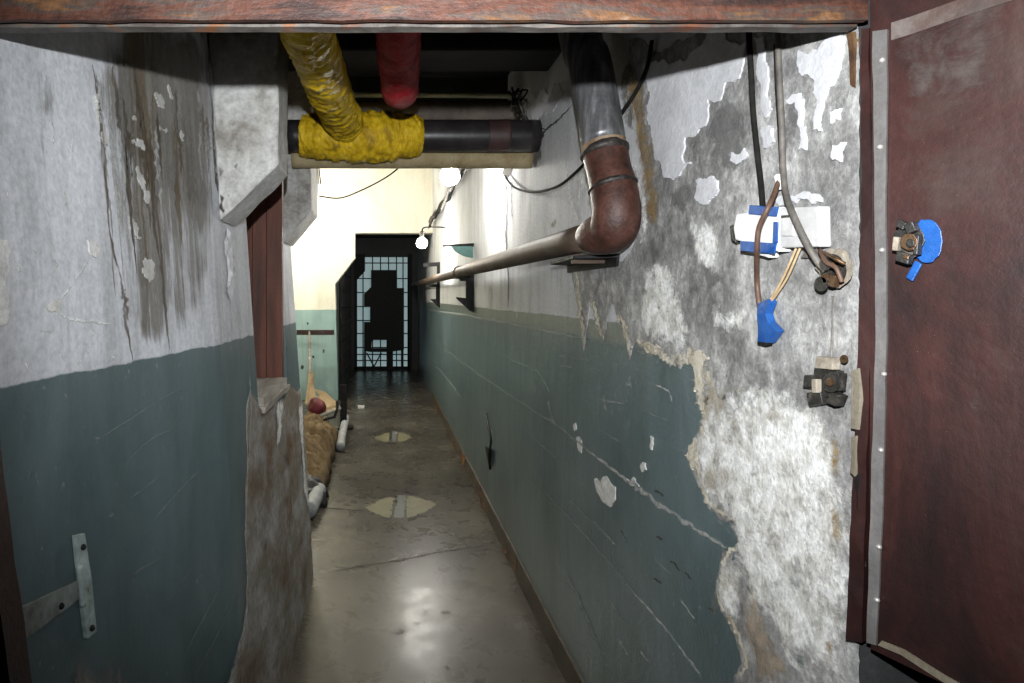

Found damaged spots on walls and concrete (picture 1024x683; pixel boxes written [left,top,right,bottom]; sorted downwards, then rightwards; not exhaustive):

peeling [154,85,174,109]
peeling [133,166,151,204]
damp [92,32,213,360]
peeling [128,216,142,240]
peeling [140,258,155,282]
spalling [572,27,860,683]